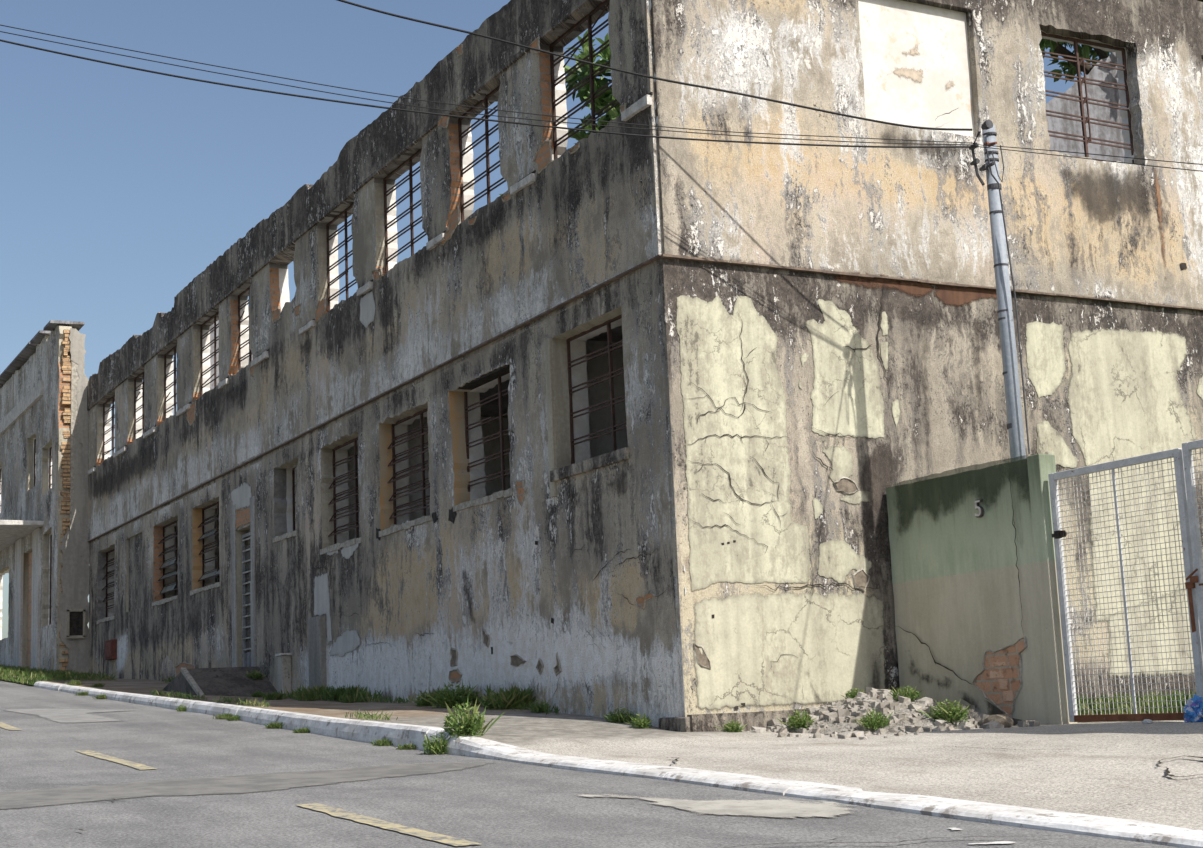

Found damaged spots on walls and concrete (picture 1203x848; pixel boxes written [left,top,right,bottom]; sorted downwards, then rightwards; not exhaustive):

water stain [882,134,956,156]
water stain [1063,169,1153,222]
crack [843,283,890,399]
crack [689,315,856,553]
water stain [94,446,152,497]
water stain [860,444,1031,559]
crack [756,582,878,595]
spalling [449,647,463,684]
spalling [510,652,562,676]
crack [898,626,971,684]
spalling [972,637,1027,717]